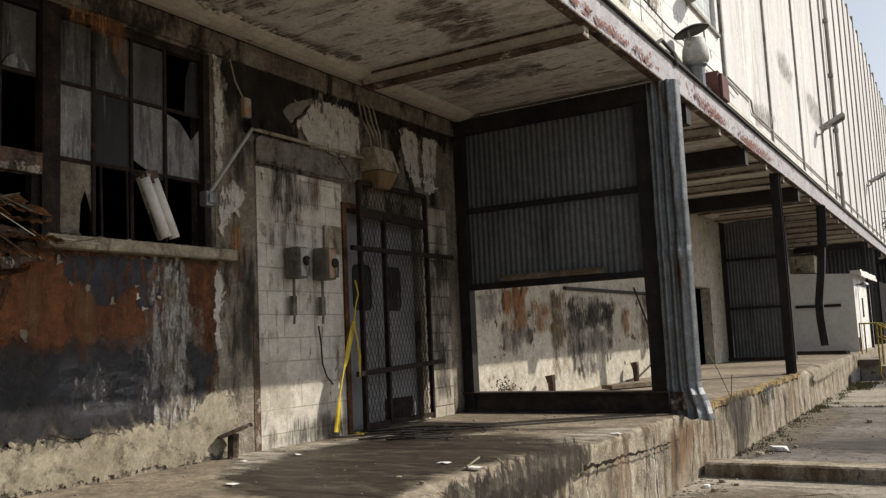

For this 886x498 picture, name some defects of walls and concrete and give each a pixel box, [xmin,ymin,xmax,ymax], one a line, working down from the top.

rust [545,0,663,82]
peeling [212,54,225,175]
peeling [218,179,246,236]
peeling [255,92,361,180]
peeling [399,127,438,195]
rust [680,94,886,257]
rust [0,192,165,359]
rust [182,259,219,393]
water stain [565,295,615,378]
peeling [0,330,240,498]
water stain [219,412,576,498]
crack [583,438,679,476]